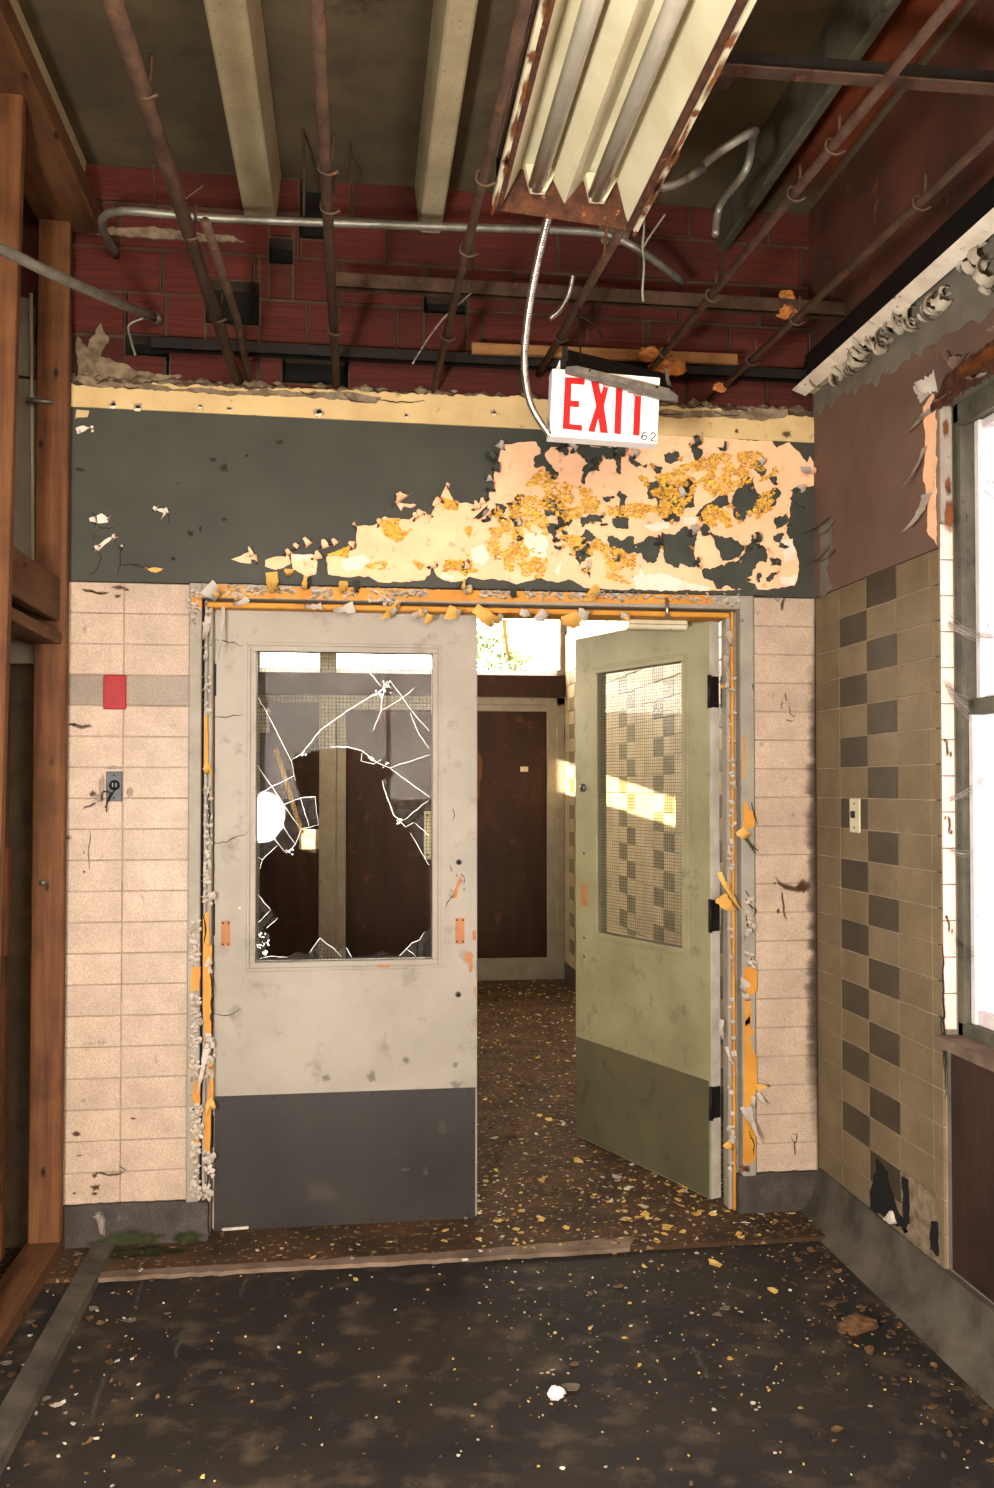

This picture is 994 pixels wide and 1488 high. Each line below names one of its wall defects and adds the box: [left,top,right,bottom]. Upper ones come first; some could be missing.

rust [632,33,737,237]
spalling [271,191,324,264]
spalling [130,344,169,363]
spalling [208,290,259,326]
spalling [424,300,465,315]
peeling [809,235,994,399]
peeling [75,410,94,434]
spalling [76,363,425,418]
peeling [186,408,836,1202]
spalling [869,1158,941,1265]